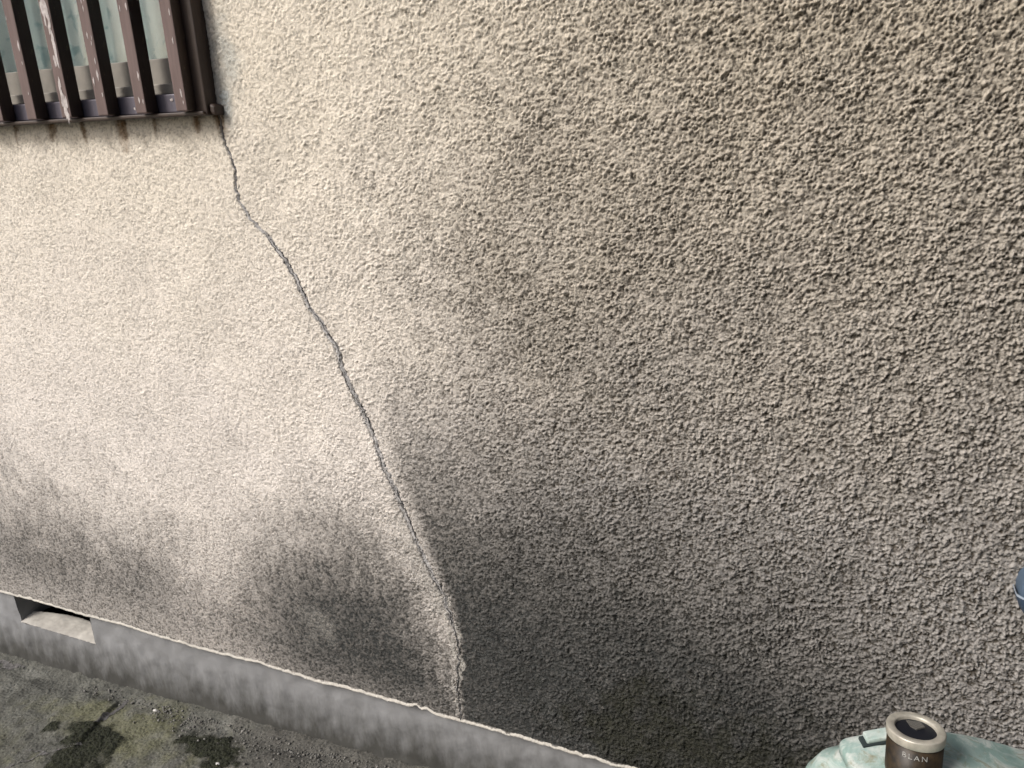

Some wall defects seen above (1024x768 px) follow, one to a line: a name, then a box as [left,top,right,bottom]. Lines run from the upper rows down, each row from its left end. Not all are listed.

crack [218,115,463,720]